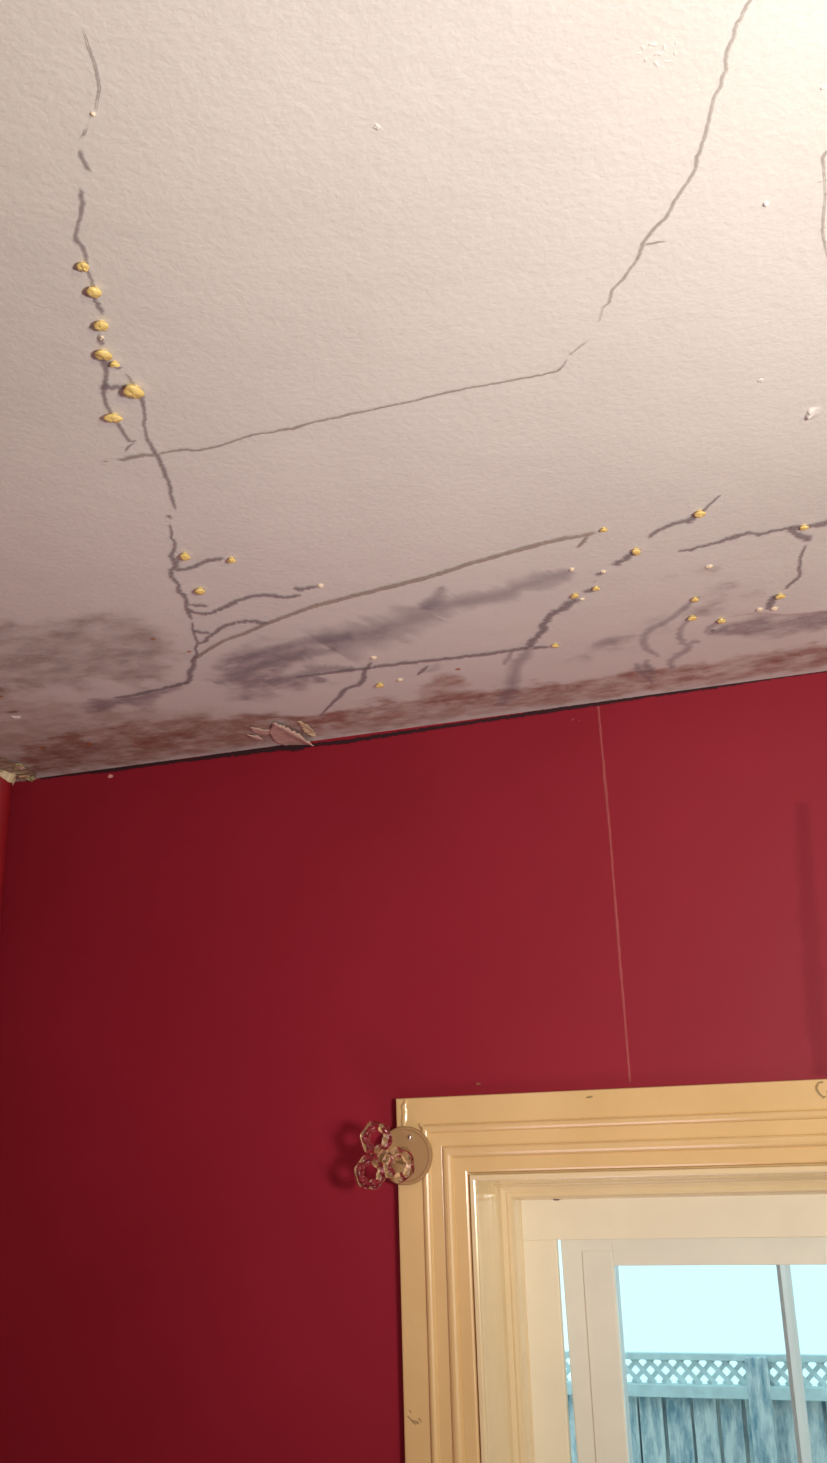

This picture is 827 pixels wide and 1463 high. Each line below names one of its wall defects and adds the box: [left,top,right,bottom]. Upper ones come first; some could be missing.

crack [819,153,827,250]
crack [75,0,752,698]
damp [188,527,608,688]
crack [39,496,827,779]
flaking render [0,758,36,782]
peeling [246,721,317,746]